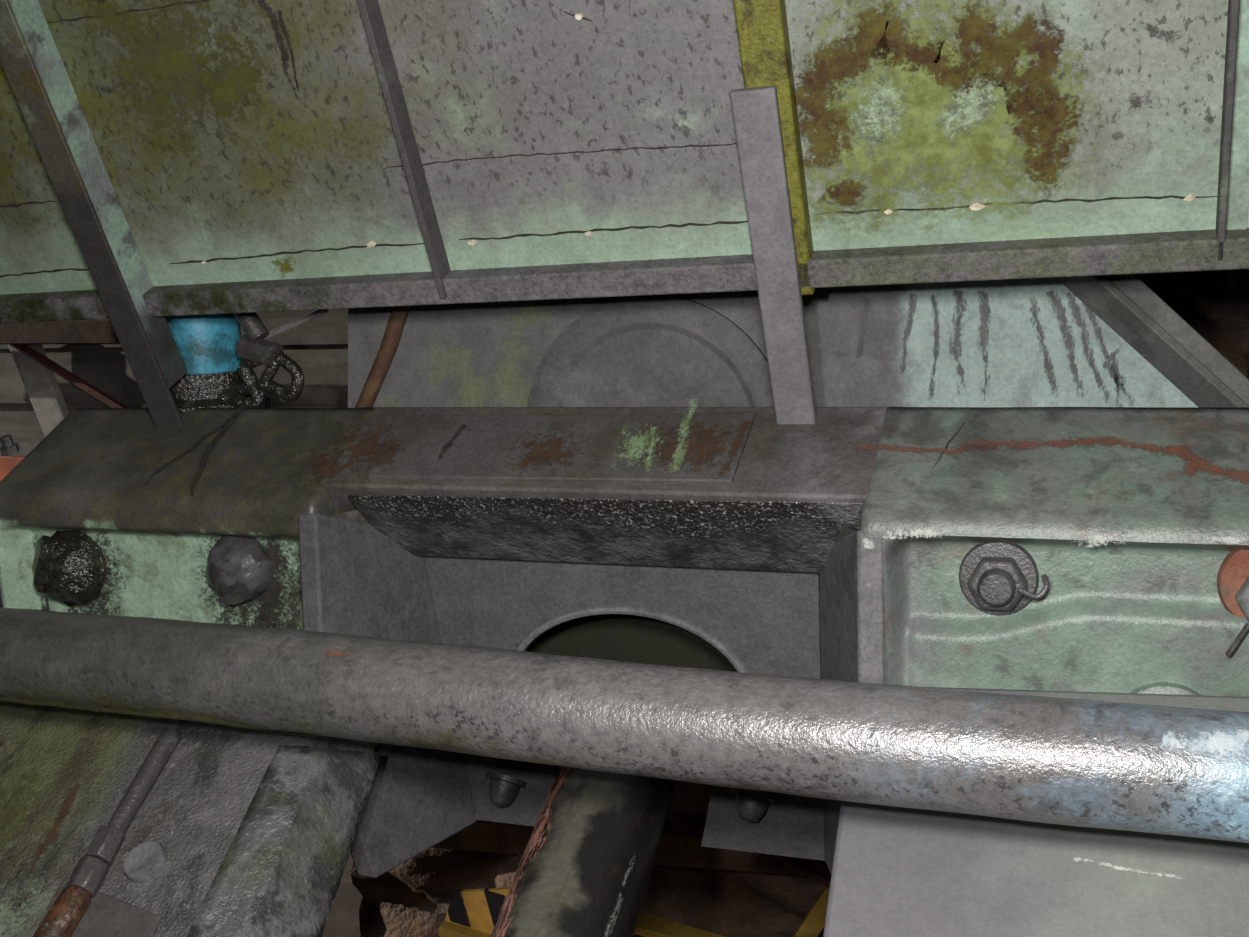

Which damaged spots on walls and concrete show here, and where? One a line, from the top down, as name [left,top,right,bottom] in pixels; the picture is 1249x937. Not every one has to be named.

leakage [258,0,299,98]
leakage [795,0,1096,226]
rust [512,435,579,469]
rust [613,398,751,476]
rust [858,436,1249,484]